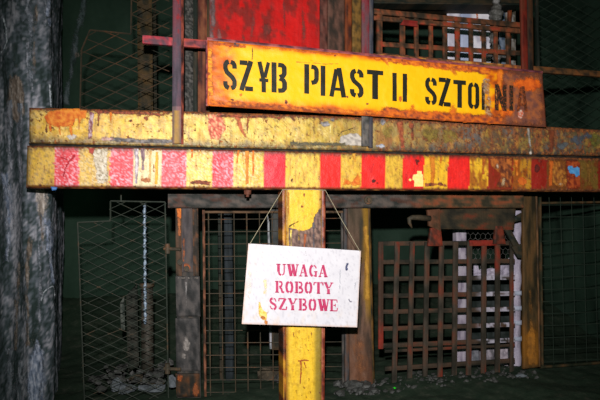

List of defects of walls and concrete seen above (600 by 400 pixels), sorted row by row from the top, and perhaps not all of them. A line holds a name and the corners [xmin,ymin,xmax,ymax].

corrosion [208,17,544,148]
corrosion [44,109,87,135]
corrosion [96,110,164,122]
spalling [340,133,361,146]
peeling [409,171,423,187]
corrosion [482,157,527,188]
corrosion [549,160,591,189]
corrosion [177,208,190,269]
peeling [289,209,321,248]